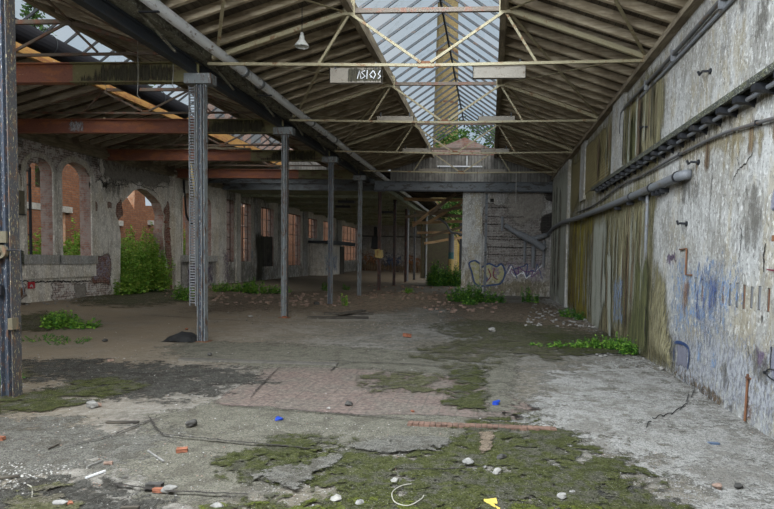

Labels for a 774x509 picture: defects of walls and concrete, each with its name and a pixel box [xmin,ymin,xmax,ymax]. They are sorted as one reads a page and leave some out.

water stain [622,74,657,163]
spalling [51,253,112,300]
spalling [163,201,173,289]
spalling [482,192,553,265]
water stain [486,166,650,338]